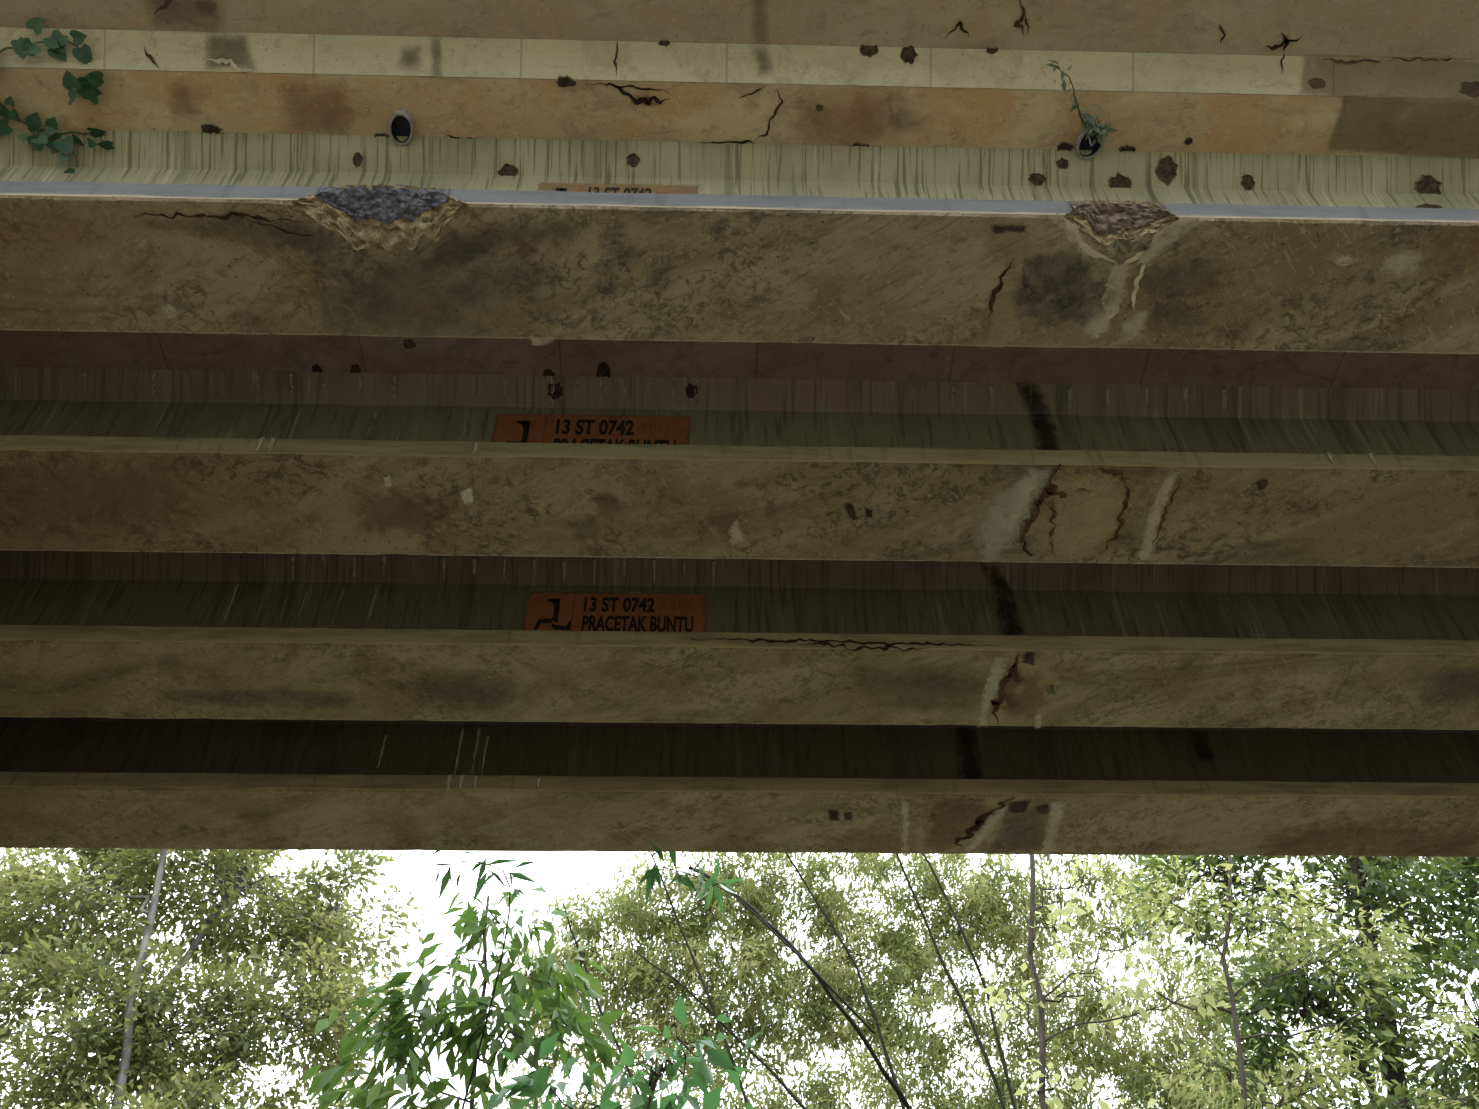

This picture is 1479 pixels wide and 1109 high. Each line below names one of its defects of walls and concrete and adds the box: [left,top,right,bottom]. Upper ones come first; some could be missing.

crack [586,42,671,106]
crack [701,86,783,144]
crack [133,212,318,239]
spalling [219,152,543,260]
spalling [1065,155,1179,245]
leakage [1018,383,1059,450]
leakage [1138,476,1183,560]
leakage [991,566,1023,635]
crack [690,638,1055,728]
crack [955,797,1050,850]